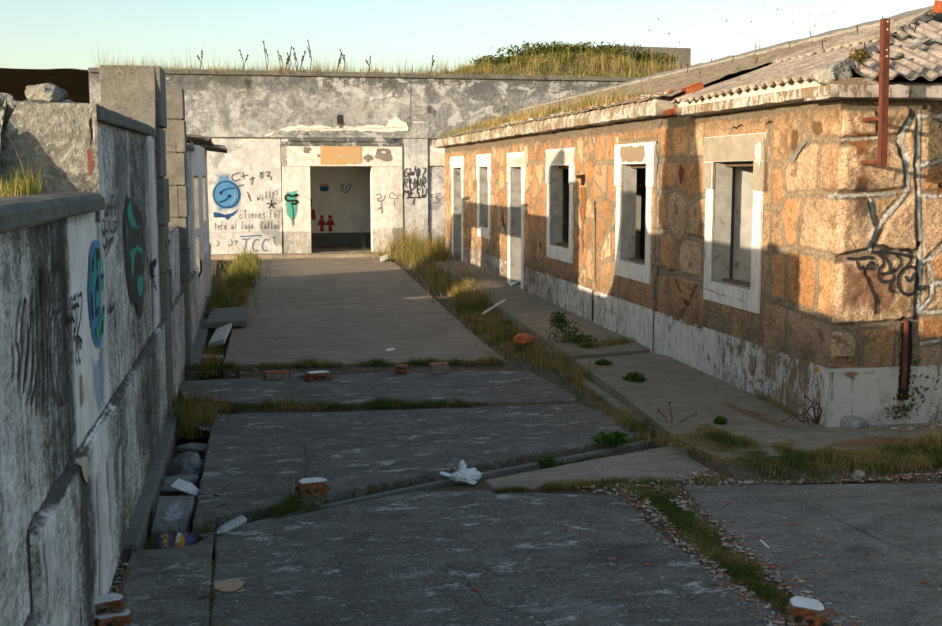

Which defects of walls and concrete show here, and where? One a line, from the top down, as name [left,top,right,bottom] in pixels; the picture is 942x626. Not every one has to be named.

rust [851,132,871,153]
peeling [718,339,767,398]